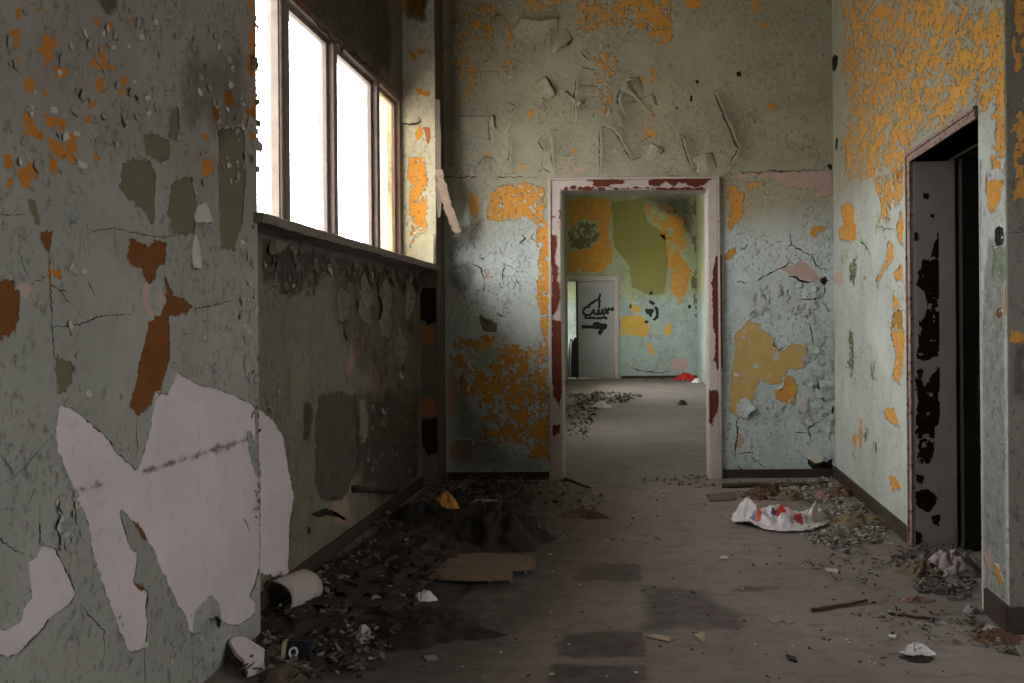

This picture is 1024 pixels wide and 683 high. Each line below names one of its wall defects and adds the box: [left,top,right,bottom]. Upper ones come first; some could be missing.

peeling [9,7,47,97]
peeling [37,34,69,79]
peeling [84,45,129,123]
peeling [3,109,77,225]
peeling [118,6,263,270]
crack [88,228,182,256]
peeling [264,235,436,340]
peeling [450,0,1024,526]
crack [738,230,878,345]
spalling [356,394,438,483]
flaking render [0,354,295,676]